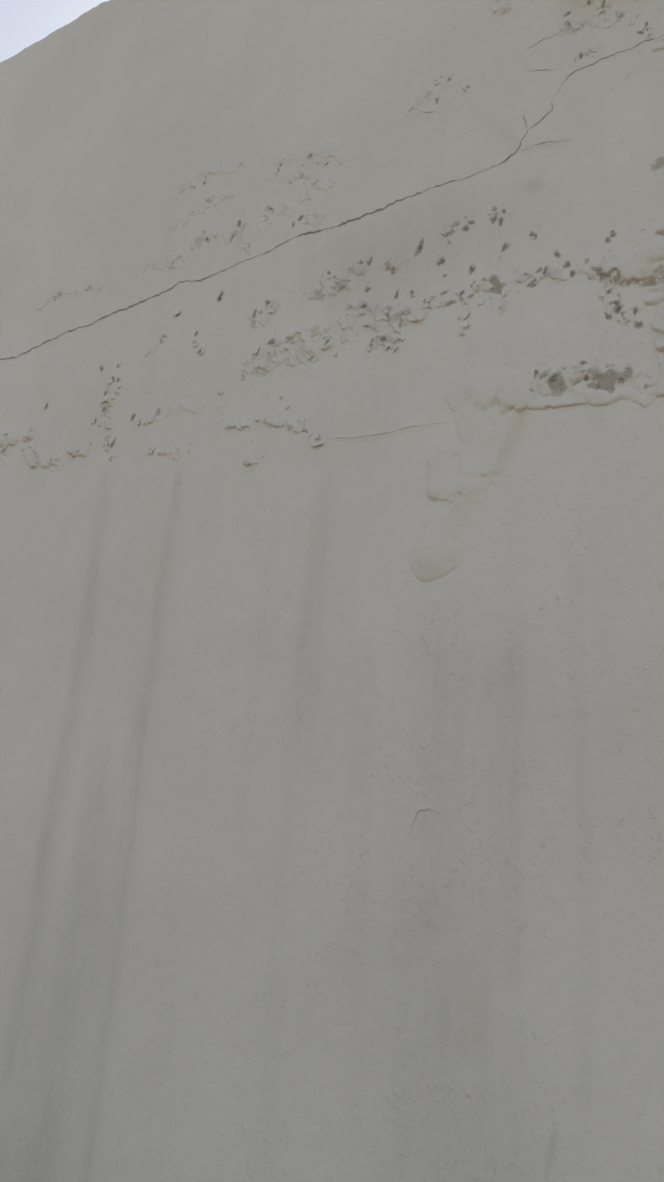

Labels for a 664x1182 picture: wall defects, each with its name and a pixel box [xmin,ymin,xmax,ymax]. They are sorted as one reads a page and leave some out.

peeling [562,0,655,37]
crack [0,25,664,362]
peeling [238,206,646,391]
peeling [90,363,127,461]
peeling [223,396,325,473]
crack [326,421,448,442]
peeling [527,357,659,403]